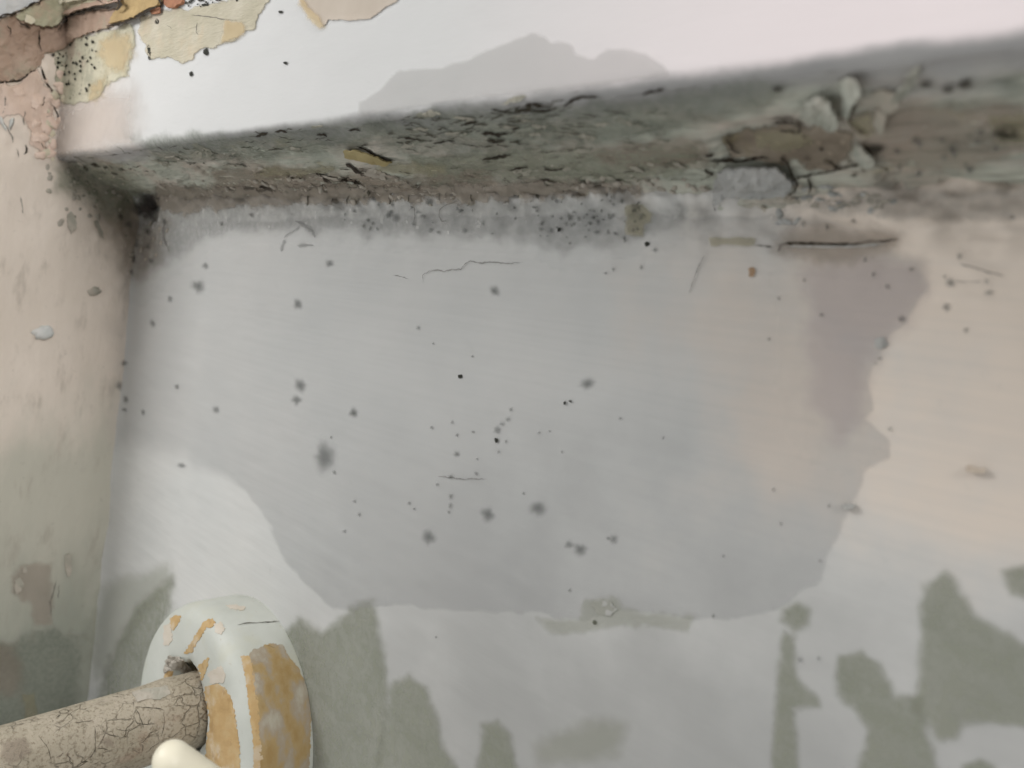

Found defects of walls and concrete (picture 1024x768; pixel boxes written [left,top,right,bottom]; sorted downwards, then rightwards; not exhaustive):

water stain [63,101,127,149]
flaking render [0,0,900,261]
crack [395,261,522,279]
crack [756,239,898,251]
water stain [106,588,168,696]
peeling [169,615,181,630]
peeling [184,618,225,654]
peeling [195,643,312,768]
water stain [288,604,450,768]
water stain [839,577,1024,768]